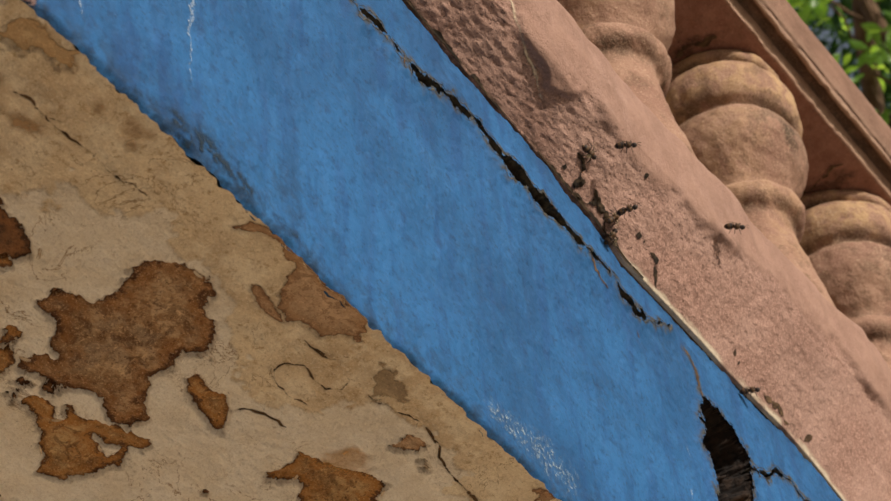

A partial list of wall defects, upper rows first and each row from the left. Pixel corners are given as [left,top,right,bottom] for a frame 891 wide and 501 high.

spalling [0,17,80,68]
crack [352,0,672,338]
peeling [233,221,367,343]
peeling [0,260,216,480]
peeling [187,374,229,429]
peeling [266,451,386,501]
hole [683,348,811,501]